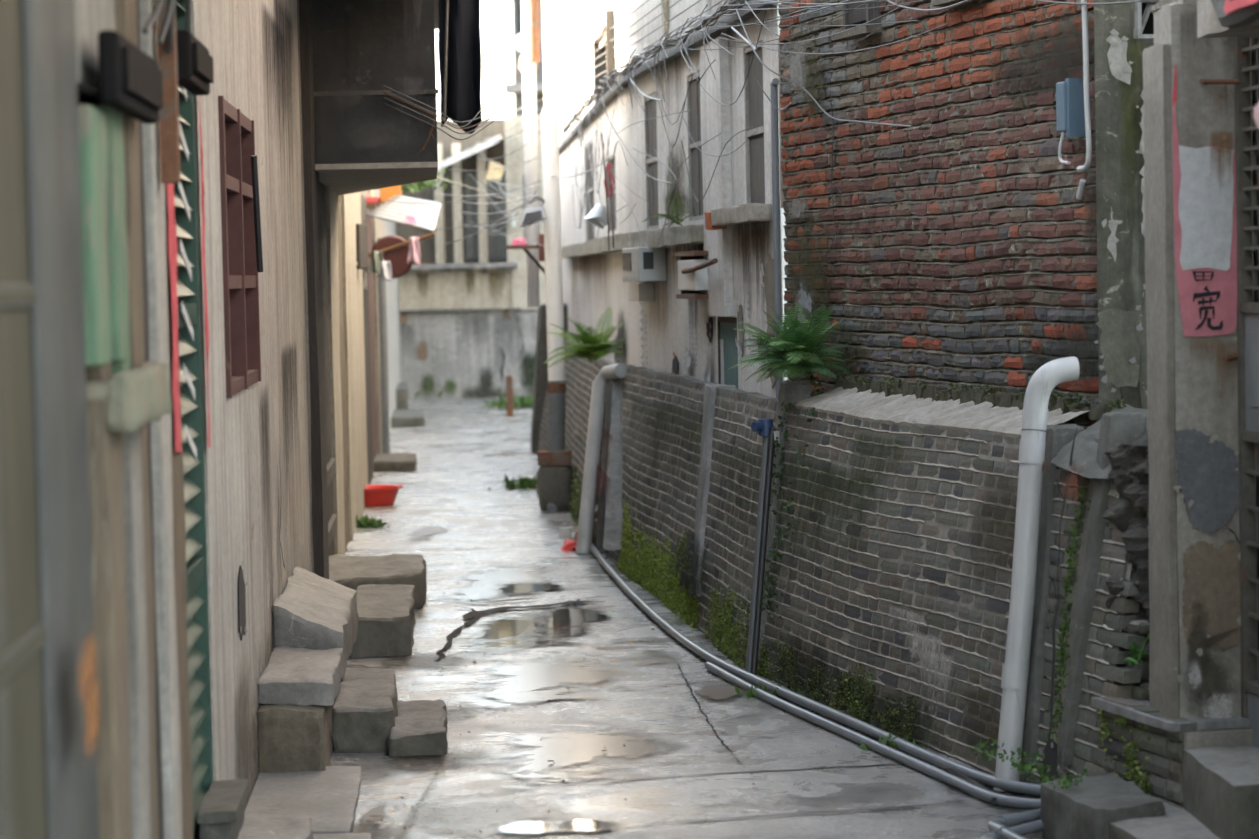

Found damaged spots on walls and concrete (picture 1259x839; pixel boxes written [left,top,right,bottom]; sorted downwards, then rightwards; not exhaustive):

peeling [1102,207,1123,262]
peeling [1106,28,1145,237]
spalling [1094,305,1143,392]
damp [671,534,705,598]
spalling [1103,443,1150,701]
spalling [1173,428,1241,656]